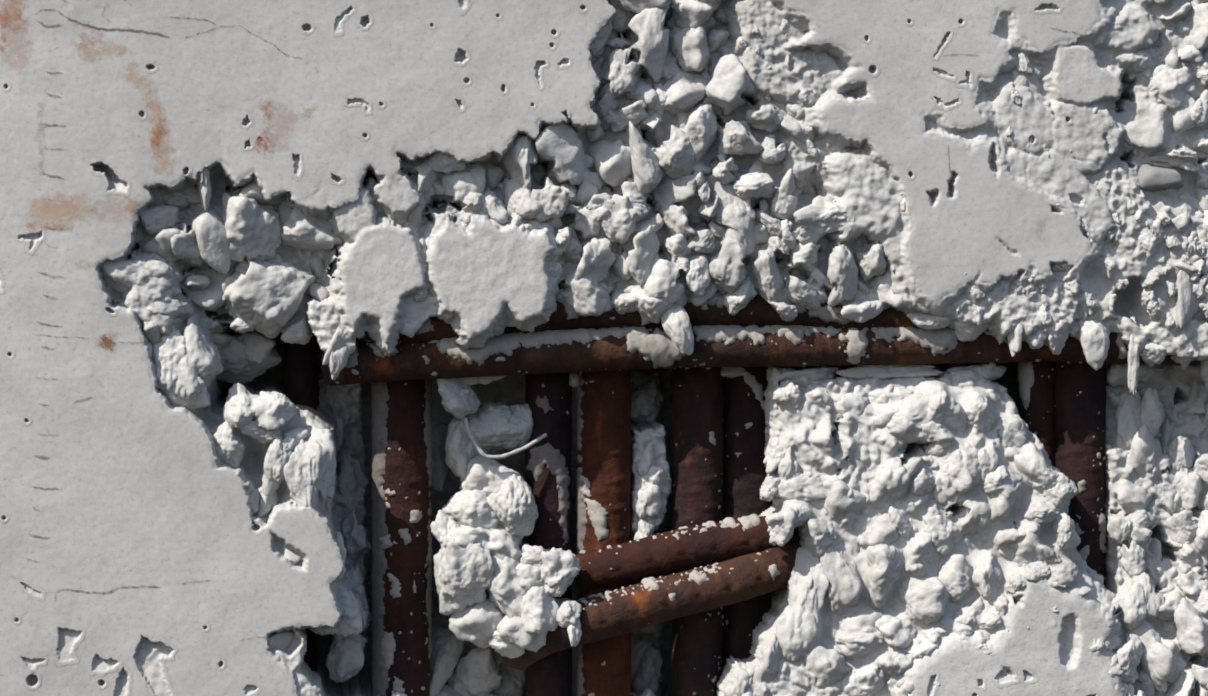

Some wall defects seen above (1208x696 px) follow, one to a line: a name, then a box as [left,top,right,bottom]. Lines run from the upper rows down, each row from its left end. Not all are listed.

crack [35,4,221,37]
spalling [455,0,471,15]
spalling [1030,1,1063,15]
spalling [88,159,131,197]
spalling [207,291,1205,696]